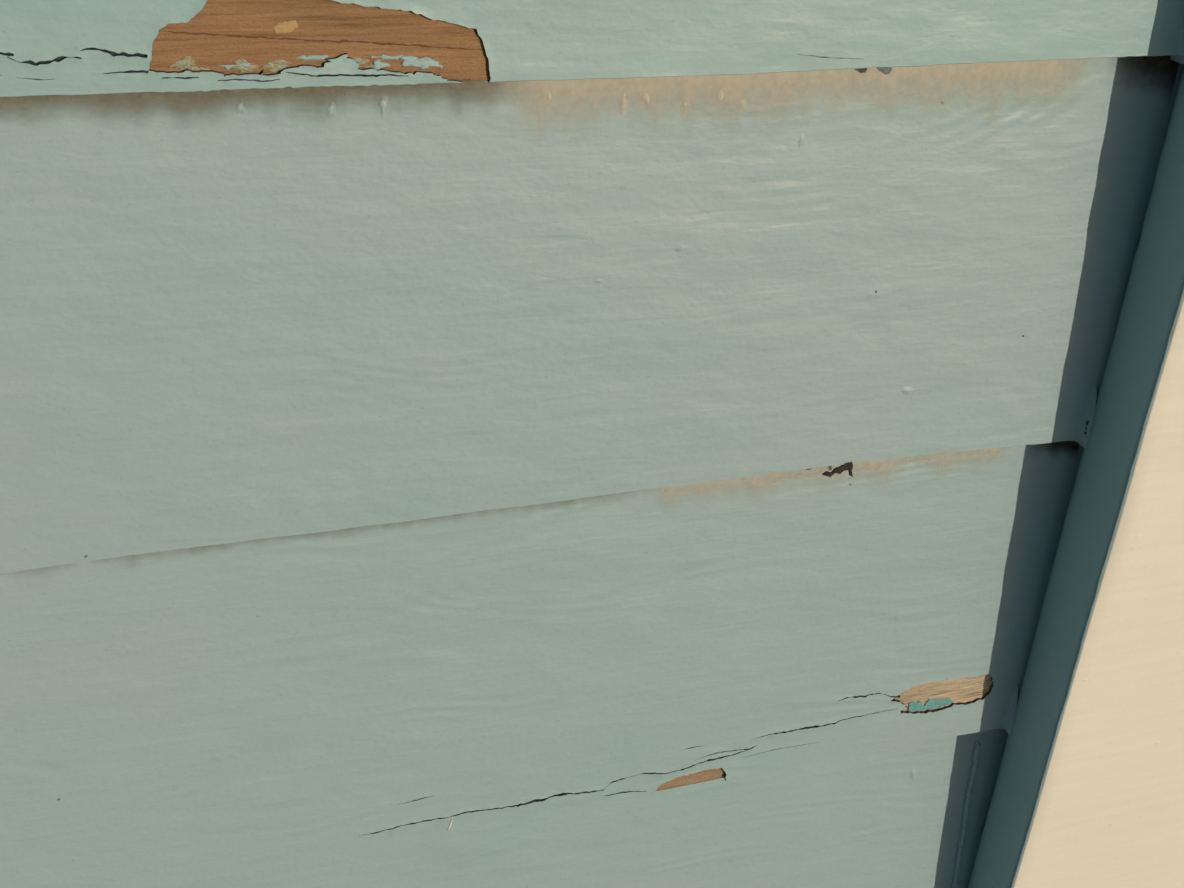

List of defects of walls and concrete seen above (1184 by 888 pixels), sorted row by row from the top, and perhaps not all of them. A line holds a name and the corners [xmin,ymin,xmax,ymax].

peeling [149,0,491,82]
crack [0,48,409,82]
peeling [891,674,993,714]
crack [359,693,901,836]
peeling [656,757,727,791]